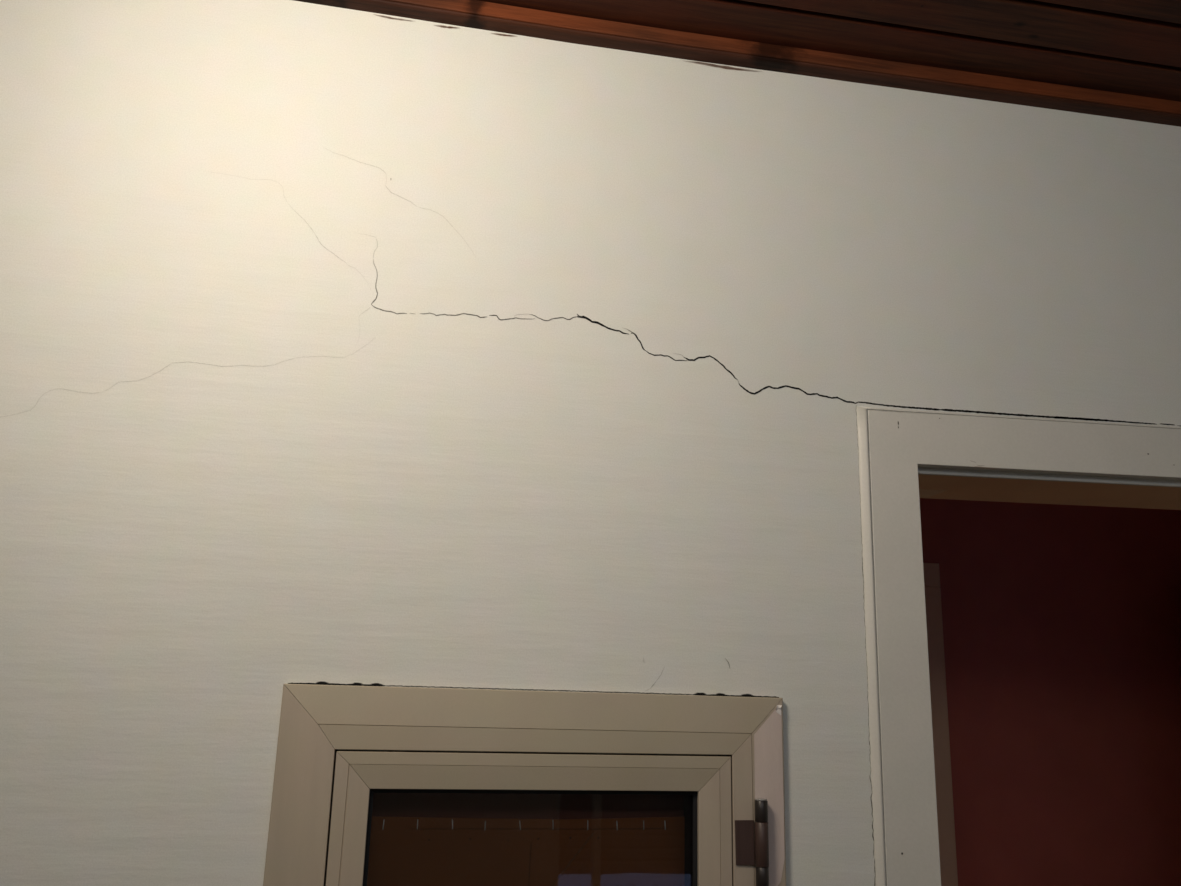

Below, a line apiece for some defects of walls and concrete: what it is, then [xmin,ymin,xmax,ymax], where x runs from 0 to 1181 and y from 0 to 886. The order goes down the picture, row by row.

crack [371,280,1179,426]